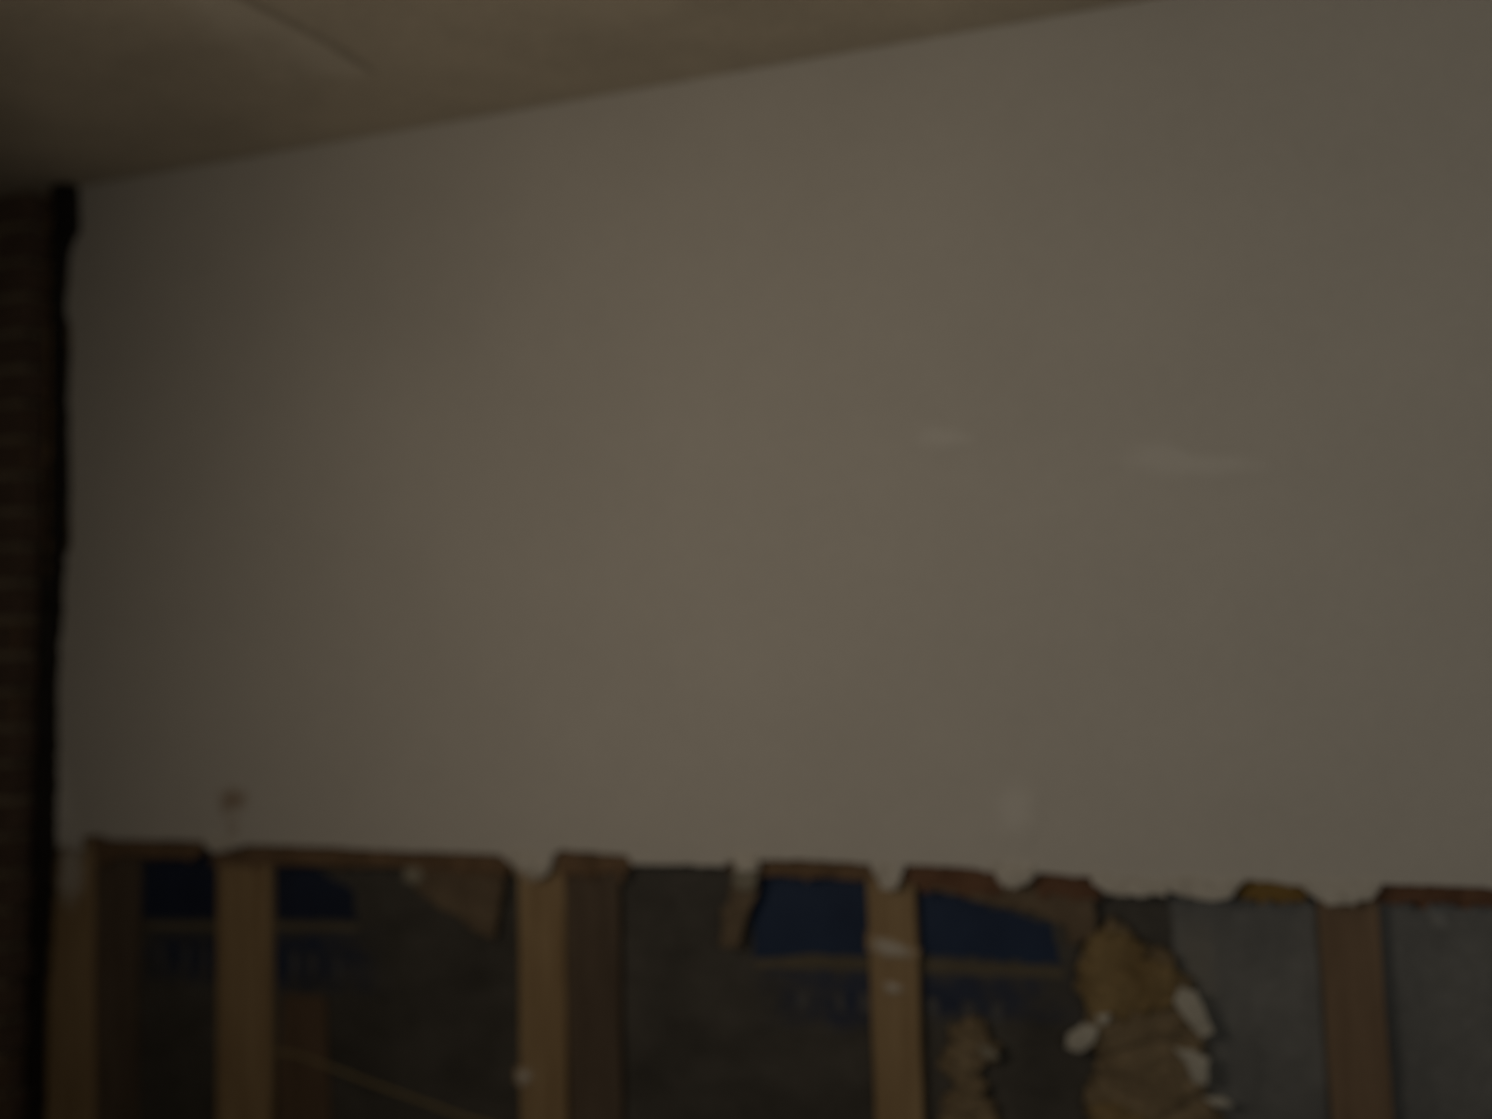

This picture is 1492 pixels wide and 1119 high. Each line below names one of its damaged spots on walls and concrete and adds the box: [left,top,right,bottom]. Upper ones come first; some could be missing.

peeling [56,755,631,882]
peeling [726,852,1492,910]
peeling [1065,927,1233,1107]